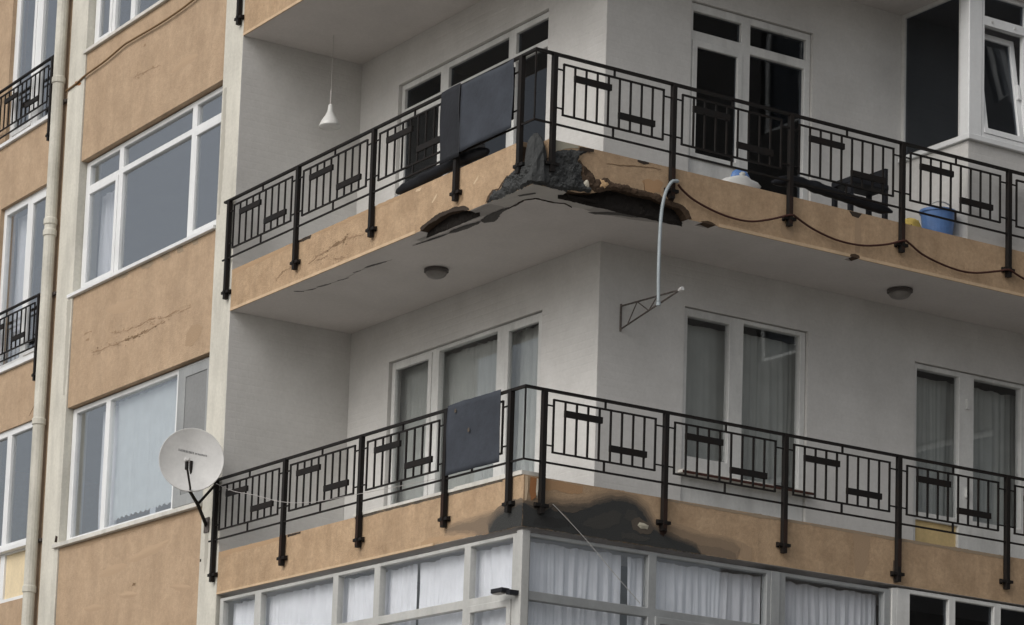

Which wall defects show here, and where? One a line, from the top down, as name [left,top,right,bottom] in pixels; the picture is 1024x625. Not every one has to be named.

spalling [420,175,508,238]
spalling [556,140,717,227]
crack [276,233,365,281]
crack [93,304,191,355]
damp [421,489,752,560]